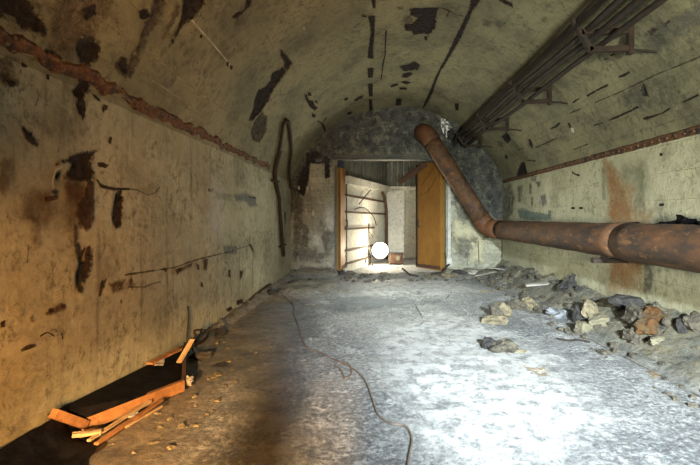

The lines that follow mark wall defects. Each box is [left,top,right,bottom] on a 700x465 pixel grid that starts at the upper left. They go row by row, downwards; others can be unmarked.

flaking render [0,0,113,67]
spalling [398,7,438,40]
rust [0,25,270,170]
spalling [249,50,292,143]
rust [503,125,700,183]
spalling [52,151,109,293]
spalling [112,190,126,230]